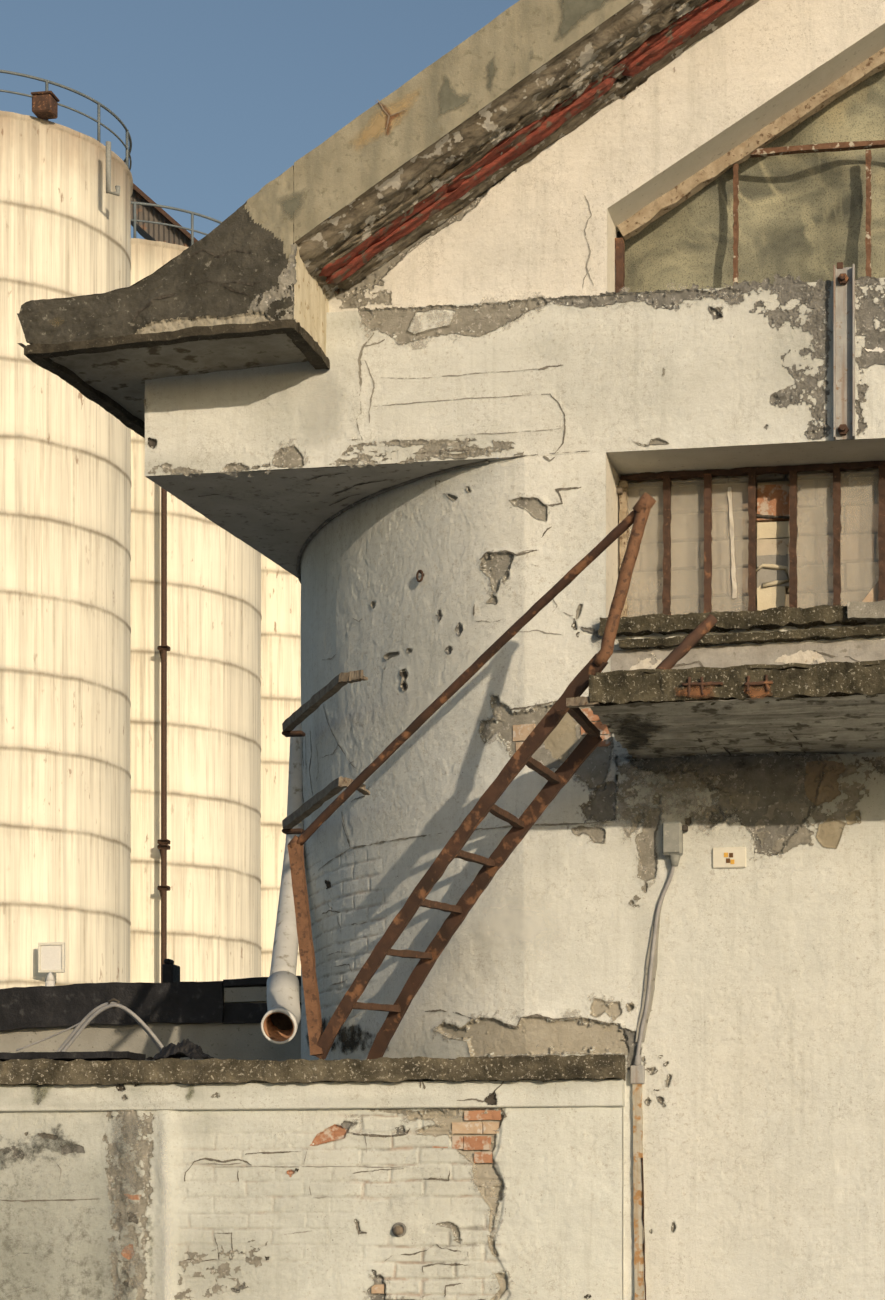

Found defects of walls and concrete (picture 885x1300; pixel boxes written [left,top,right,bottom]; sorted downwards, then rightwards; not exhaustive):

spalling [135,243,298,334]
spalling [219,438,308,474]
peeling [329,438,524,468]
crack [356,333,586,462]
peeling [855,276,885,435]
spalling [444,487,581,654]
spalling [571,604,583,637]
spalling [478,696,885,908]
spalling [425,993,672,1107]
mould [0,1125,85,1169]
spalling [286,1108,513,1300]
peeling [174,1239,269,1300]